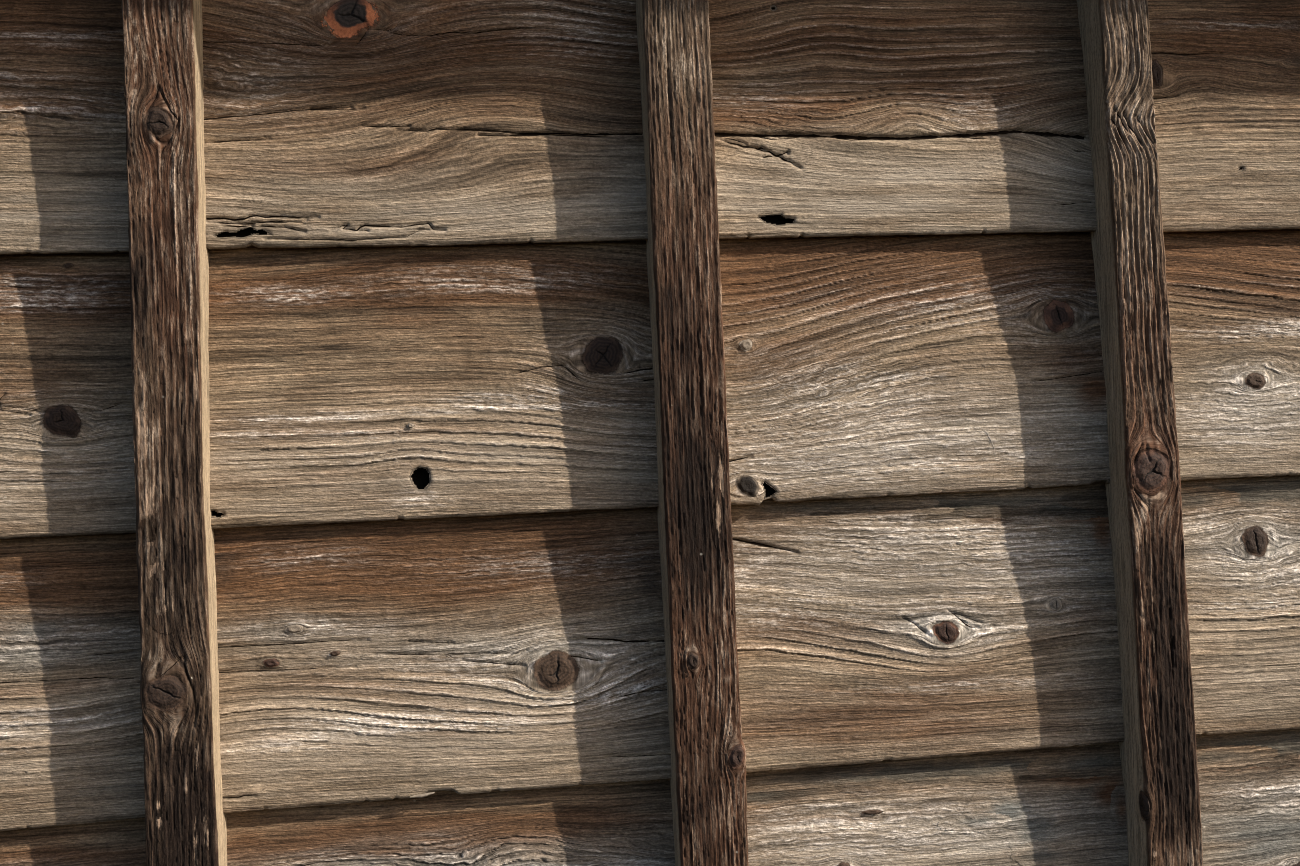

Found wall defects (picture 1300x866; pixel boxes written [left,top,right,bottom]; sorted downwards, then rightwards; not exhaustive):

crack [1111,97,1168,140]
crack [714,130,1085,166]
crack [206,215,436,241]